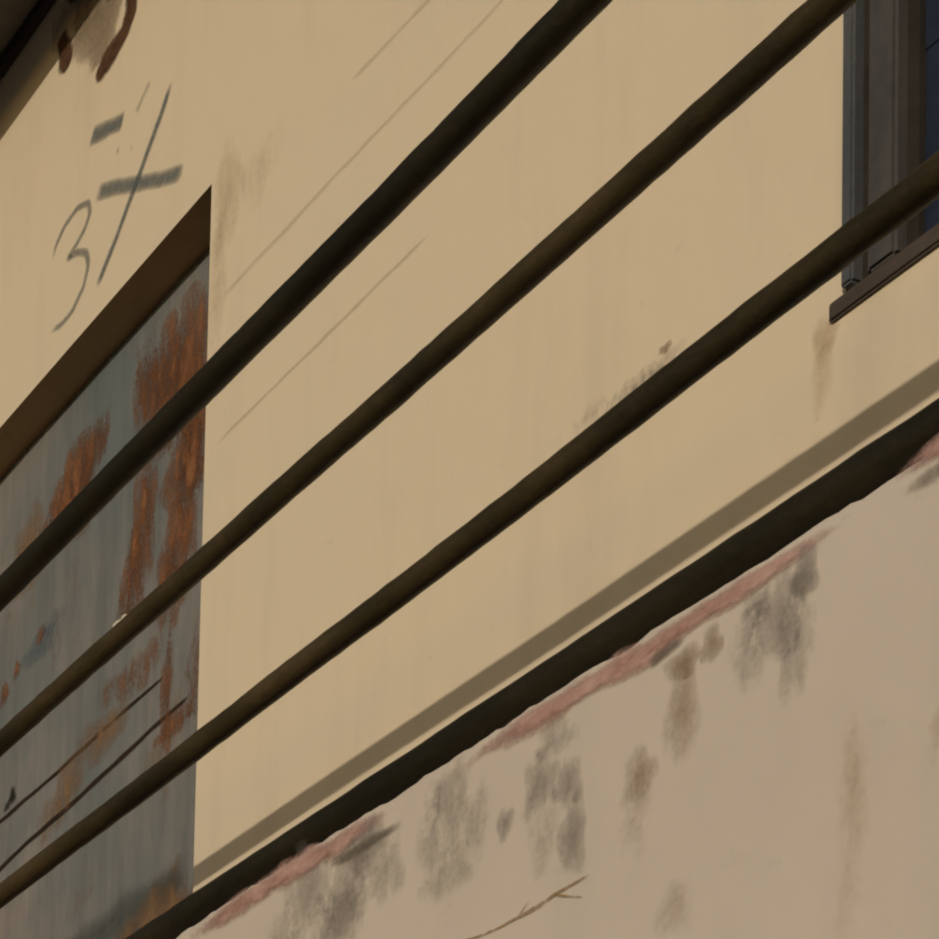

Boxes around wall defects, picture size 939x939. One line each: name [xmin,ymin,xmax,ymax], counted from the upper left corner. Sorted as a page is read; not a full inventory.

rust [135,293,208,423]
rust [21,426,109,553]
rust [119,407,206,613]
spalling [914,436,939,467]
rust [153,646,199,752]
spalling [484,540,815,750]
rust [124,882,180,938]
spalling [209,820,391,927]